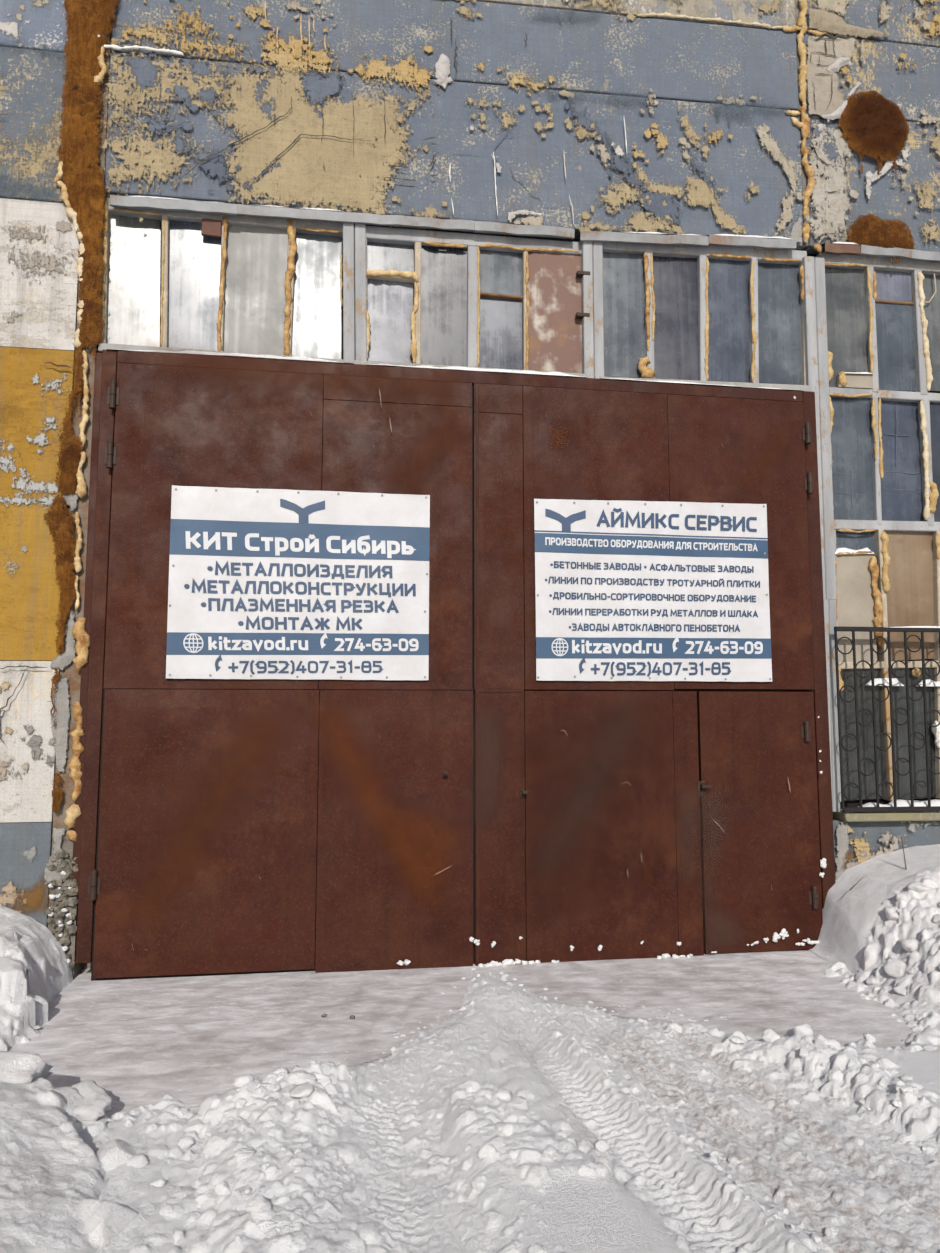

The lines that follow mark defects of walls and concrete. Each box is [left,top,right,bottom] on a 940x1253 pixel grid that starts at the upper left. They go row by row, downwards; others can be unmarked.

peeling [0,0,55,47]
peeling [456,0,484,20]
peeling [0,100,63,191]
peeling [90,0,455,229]
peeling [464,62,749,235]
spalling [752,0,940,245]
peeling [1,221,73,285]
peeling [32,373,69,396]
spalling [0,609,76,781]
spalling [22,826,66,885]
spalling [835,821,937,881]
spalling [0,881,27,913]